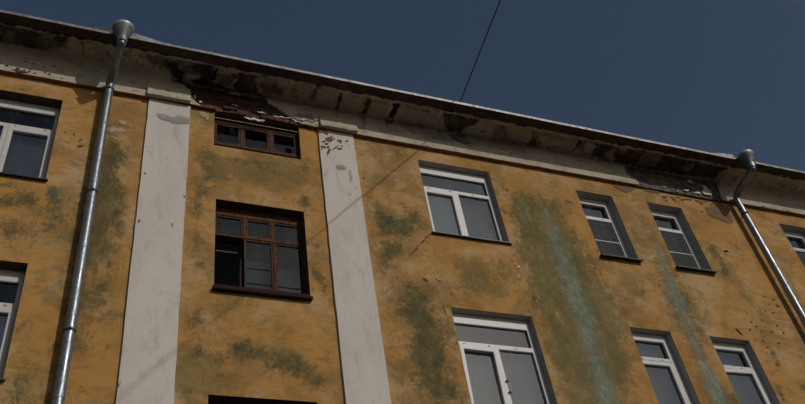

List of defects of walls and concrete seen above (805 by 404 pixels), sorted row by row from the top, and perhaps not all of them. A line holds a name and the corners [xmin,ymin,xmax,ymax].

damp [0,25,69,51]
flaking render [179,68,349,156]
flaking render [443,113,479,144]
flaking render [615,166,734,224]